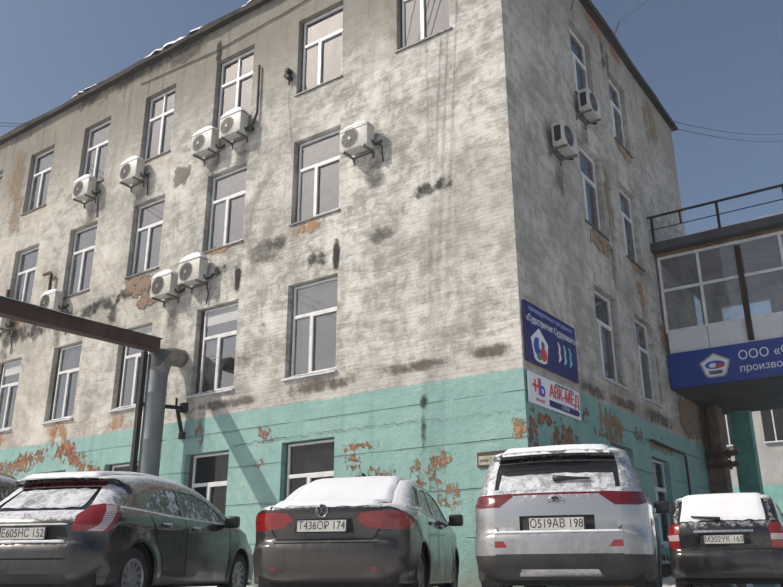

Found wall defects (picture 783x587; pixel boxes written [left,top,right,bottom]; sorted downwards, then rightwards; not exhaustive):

damp [415,178,452,198]
damp [69,289,131,324]
spalling [124,273,157,309]
damp [0,324,43,358]
peeling [510,408,589,447]
peeling [0,440,103,479]
peeling [342,441,396,477]
peeling [410,447,461,511]